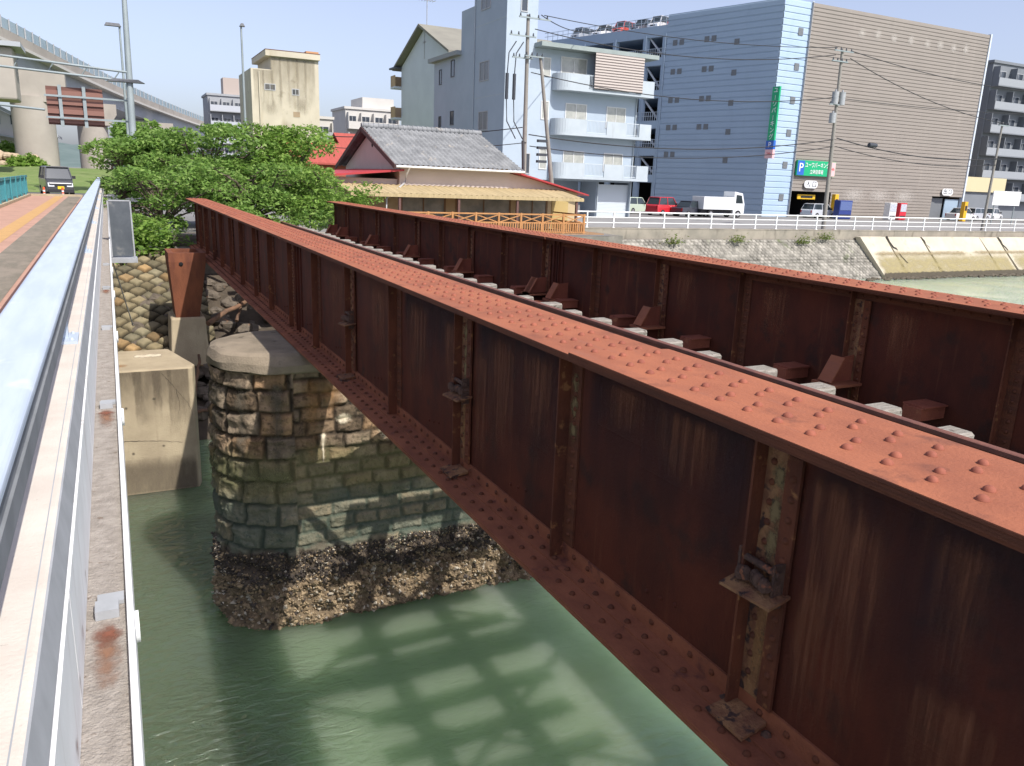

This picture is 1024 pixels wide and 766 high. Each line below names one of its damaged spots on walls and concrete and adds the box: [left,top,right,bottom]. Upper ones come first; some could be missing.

corrosion [98,626,118,673]